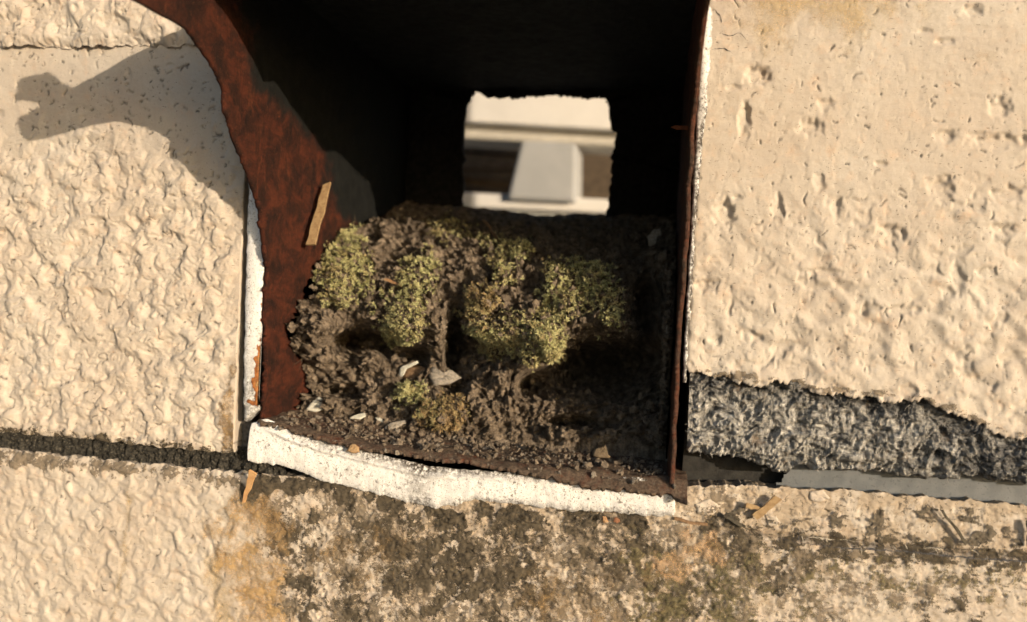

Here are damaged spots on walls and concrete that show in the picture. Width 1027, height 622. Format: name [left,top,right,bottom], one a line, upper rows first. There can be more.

corrosion [247,338,261,407]
spalling [686,371,1027,484]
water stain [0,364,1027,622]